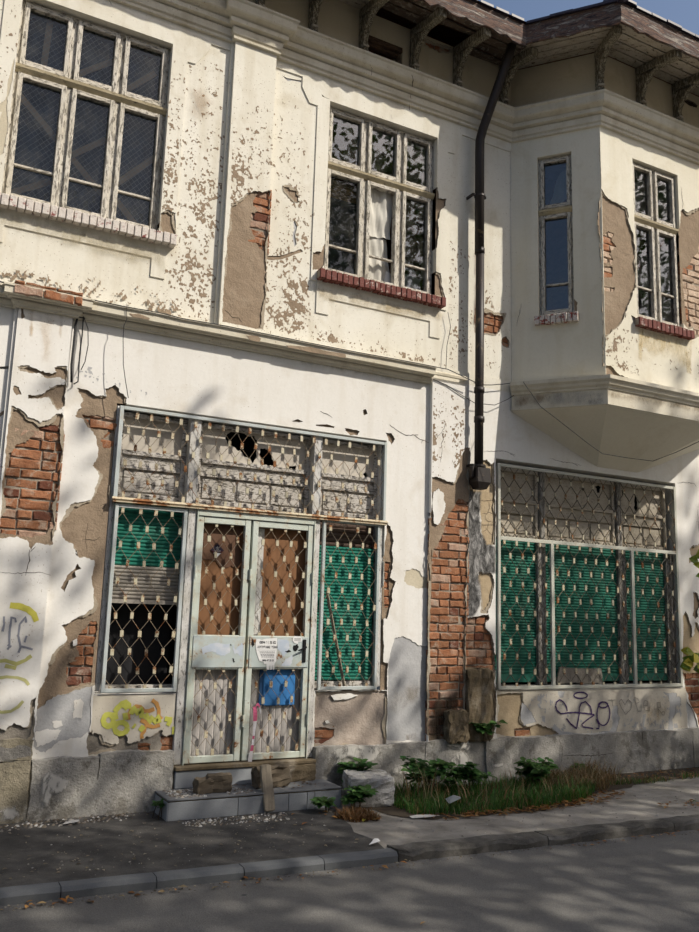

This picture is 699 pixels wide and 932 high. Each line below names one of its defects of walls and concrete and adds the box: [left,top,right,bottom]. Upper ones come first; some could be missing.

flaking render [2,63,509,368]
flaking render [597,192,677,377]
flaking render [677,208,699,353]
flaking render [0,365,173,762]
flaking render [314,388,569,767]
flaking render [623,593,699,731]